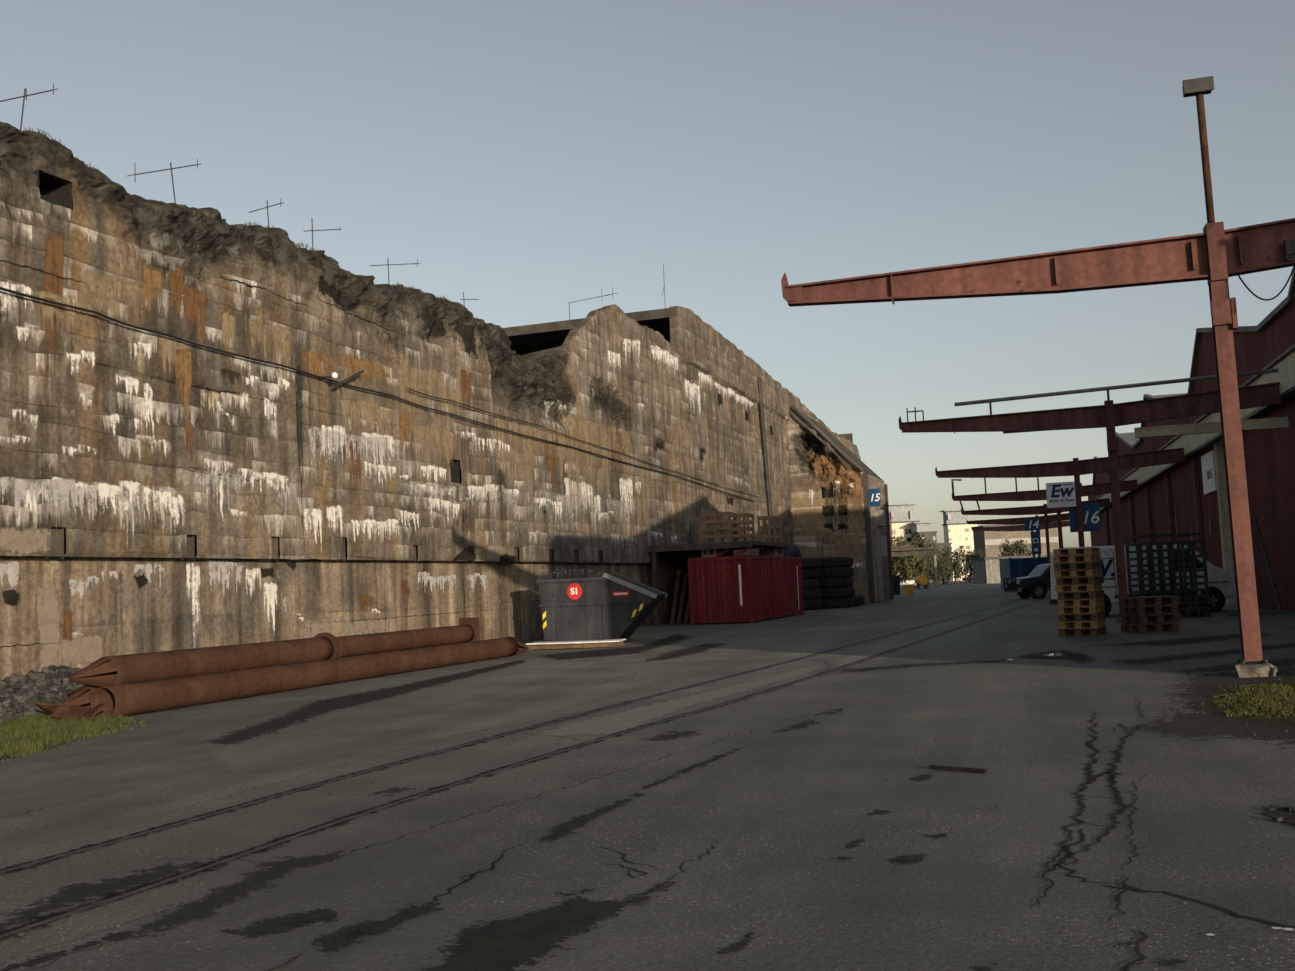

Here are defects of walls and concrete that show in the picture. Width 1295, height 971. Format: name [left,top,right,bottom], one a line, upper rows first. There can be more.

damp [0,282,33,340]
damp [67,350,95,374]
damp [134,342,151,358]
damp [608,339,754,416]
damp [0,366,519,552]
damp [535,463,677,553]
damp [0,561,19,588]
damp [69,563,165,605]
damp [186,560,303,632]
crack [1029,696,1295,971]
damp [0,850,444,971]
damp [422,879,676,971]